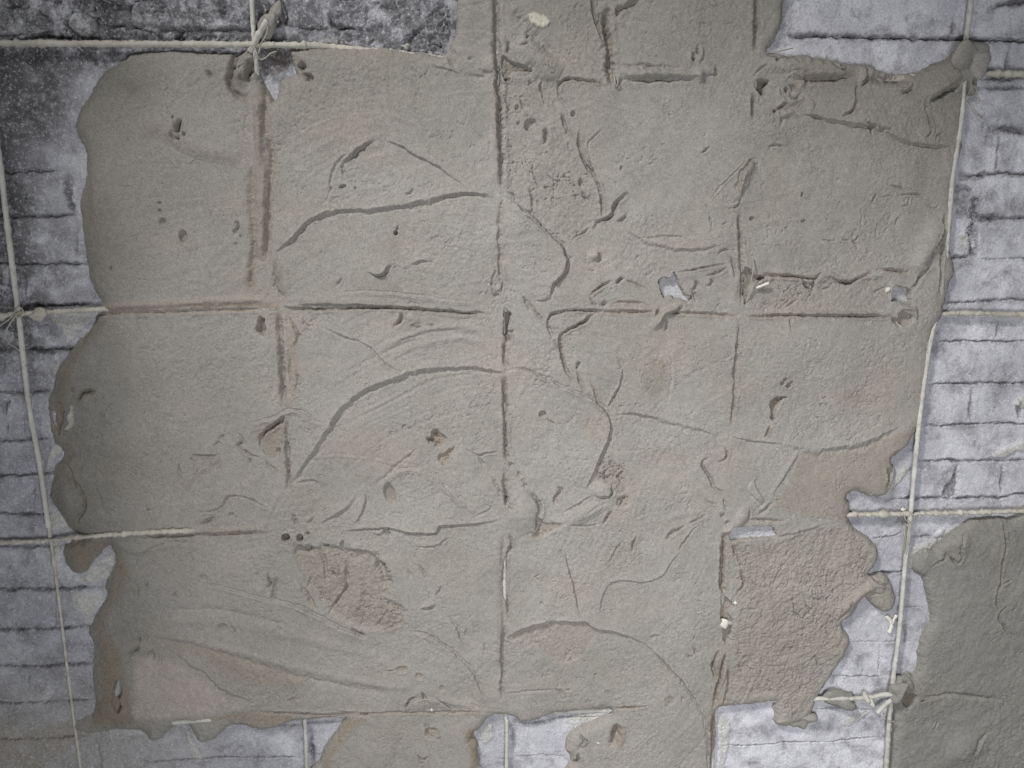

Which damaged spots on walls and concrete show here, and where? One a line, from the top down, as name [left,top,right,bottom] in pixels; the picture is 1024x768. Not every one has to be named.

spalling [659,273,690,301]
spalling [885,286,919,328]
crack [520,276,650,409]
crack [465,448,498,467]
spalling [941,467,959,496]
peeling [47,493,68,580]
spalling [729,526,775,539]
spalling [570,722,628,767]